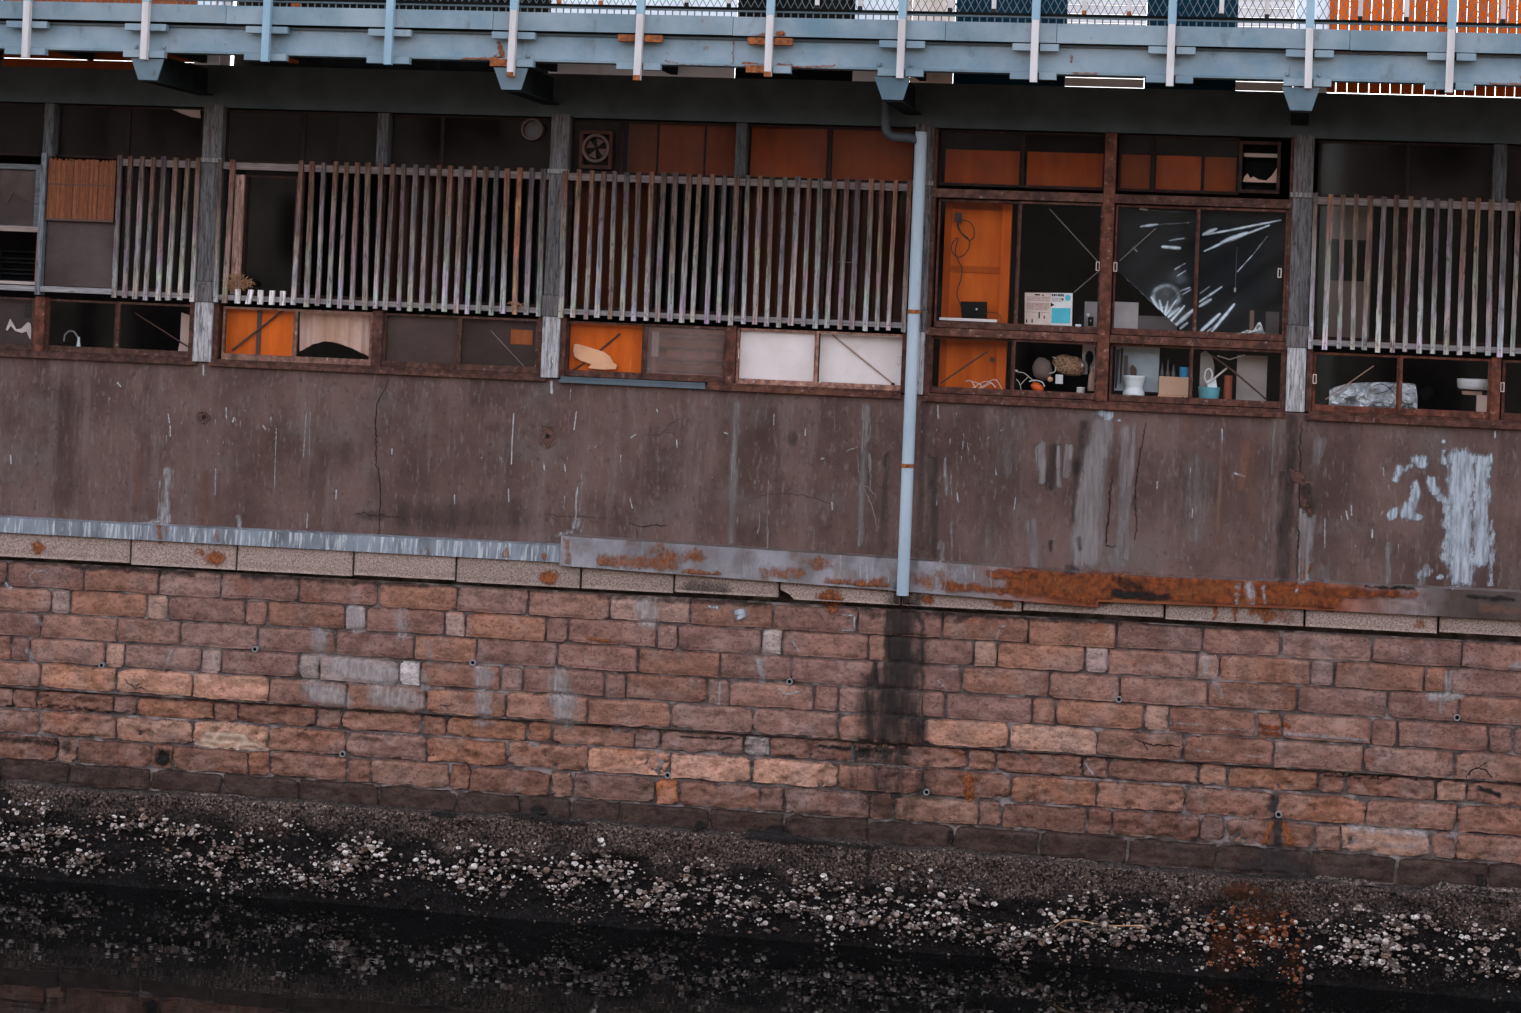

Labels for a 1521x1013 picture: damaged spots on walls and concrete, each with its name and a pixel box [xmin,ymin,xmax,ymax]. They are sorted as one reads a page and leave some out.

peeling [1098,409,1121,422]
leakage [1235,416,1313,605]
peeling [1387,440,1495,587]
rust [195,533,226,566]
rust [597,543,720,576]
rust [759,555,889,614]
rust [914,558,1418,626]
leakage [1142,621,1295,632]
leakage [842,588,1122,808]